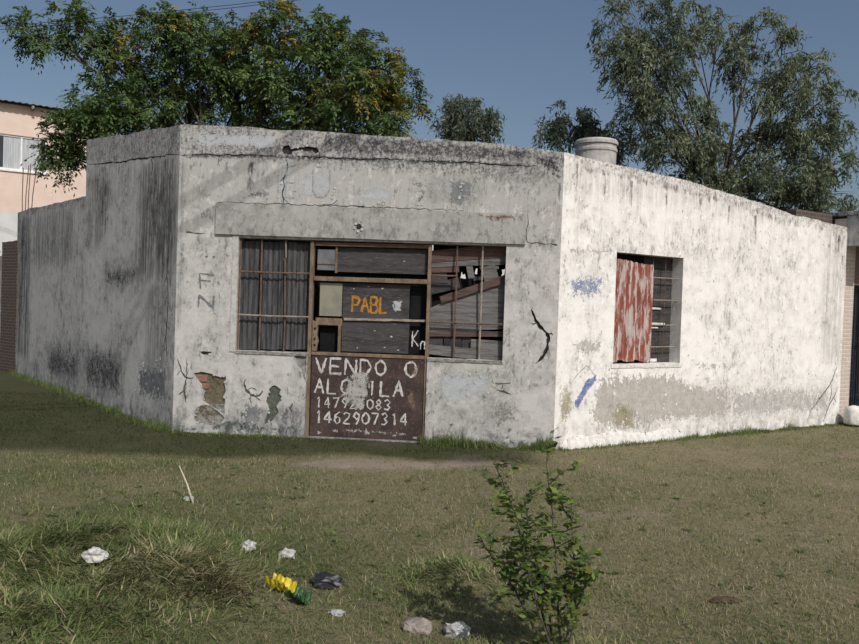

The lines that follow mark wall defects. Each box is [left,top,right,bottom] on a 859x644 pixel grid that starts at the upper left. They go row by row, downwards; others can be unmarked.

crack [90,151,464,213]
crack [420,157,531,167]
crack [162,227,205,402]
crack [531,309,553,364]
leakage [47,347,119,394]
spalling [193,372,226,426]
crack [244,379,263,404]
spalling [242,385,283,424]
crack [807,368,837,422]